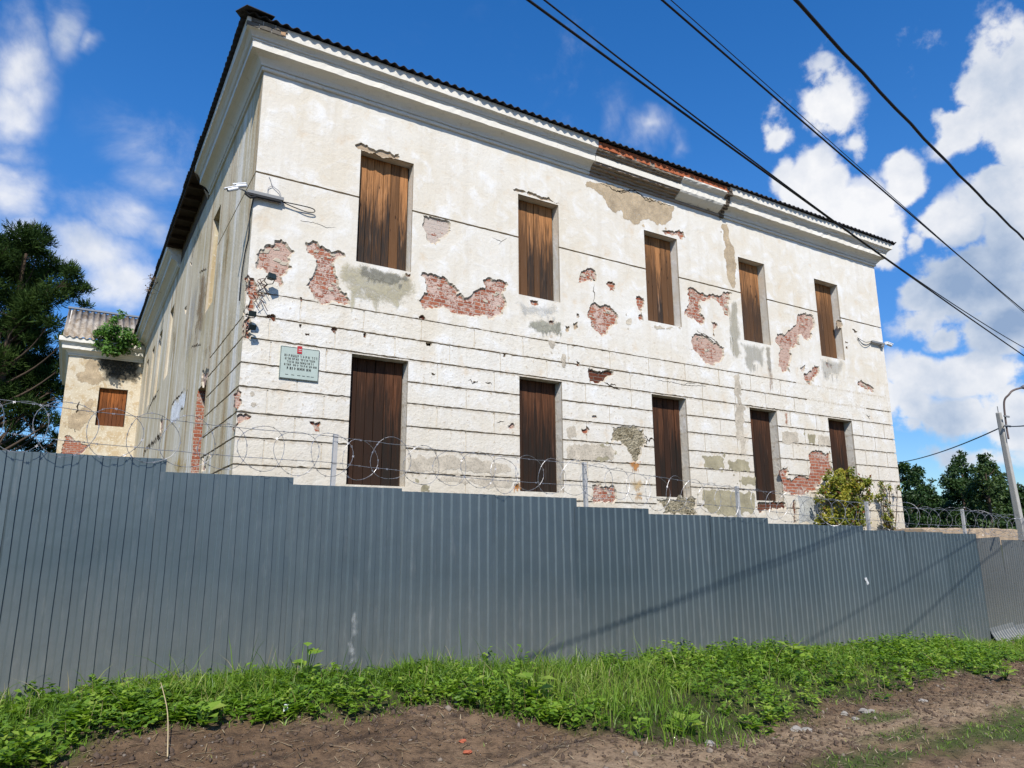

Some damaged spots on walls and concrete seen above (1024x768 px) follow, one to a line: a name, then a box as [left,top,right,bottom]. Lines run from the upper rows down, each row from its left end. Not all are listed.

spalling [422,215,451,245]
peeling [585,181,685,240]
spalling [242,239,350,339]
water stain [342,266,411,307]
spalling [405,272,508,320]
spalling [654,219,737,366]
spalling [548,296,644,384]
spalling [775,312,832,386]
spalling [657,374,834,524]